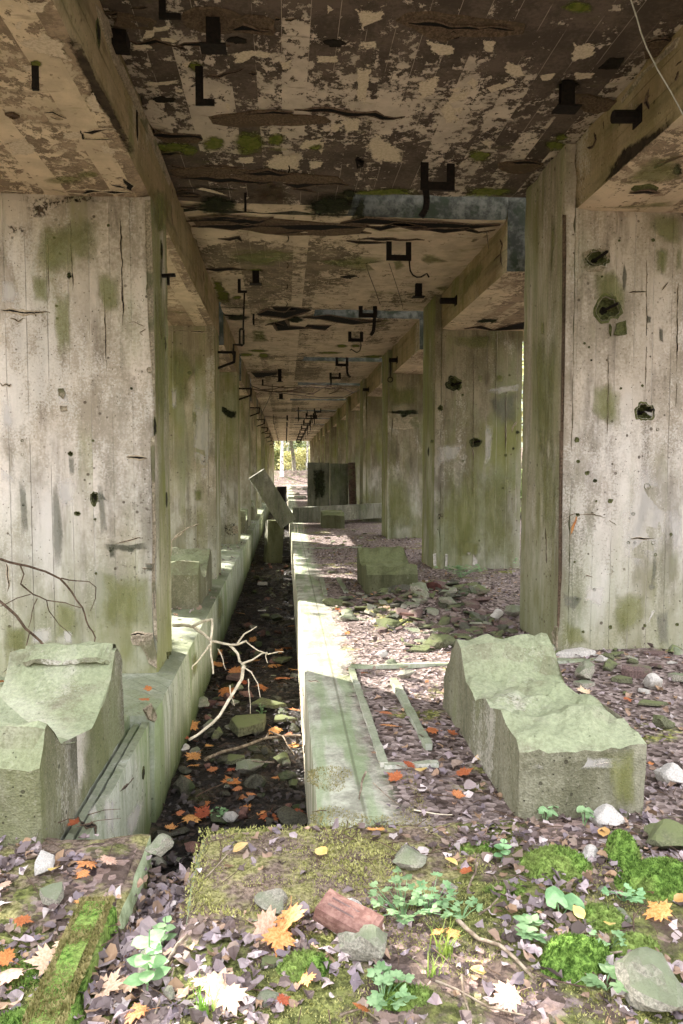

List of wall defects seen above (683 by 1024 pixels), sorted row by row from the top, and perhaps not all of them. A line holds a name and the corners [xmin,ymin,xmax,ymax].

peeling [355,4,387,27]
peeling [226,36,292,70]
peeling [571,43,598,80]
spalling [95,3,183,185]
crack [294,107,405,120]
spalling [209,102,361,175]
peeling [355,132,405,169]
leakage [35,279,45,298]
leakage [100,278,117,307]
leakage [56,300,68,342]
leakage [53,493,62,556]
leakage [8,630,23,649]